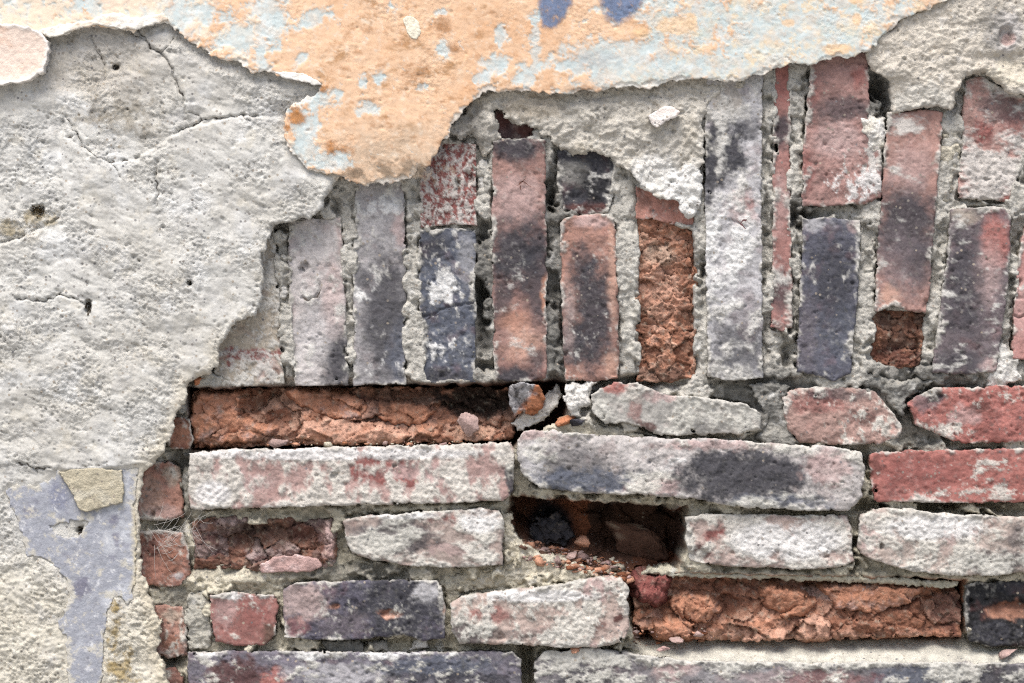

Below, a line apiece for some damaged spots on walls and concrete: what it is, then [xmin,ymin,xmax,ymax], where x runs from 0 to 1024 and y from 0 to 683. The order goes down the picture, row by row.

peeling [0,12,168,86]
crack [135,35,252,133]
peeling [273,71,321,85]
spalling [648,106,680,128]
spalling [635,218,698,383]
spalling [870,309,926,369]
spalling [189,385,518,449]
peeling [6,468,139,683]
spalling [192,515,338,573]
spalling [628,566,962,643]